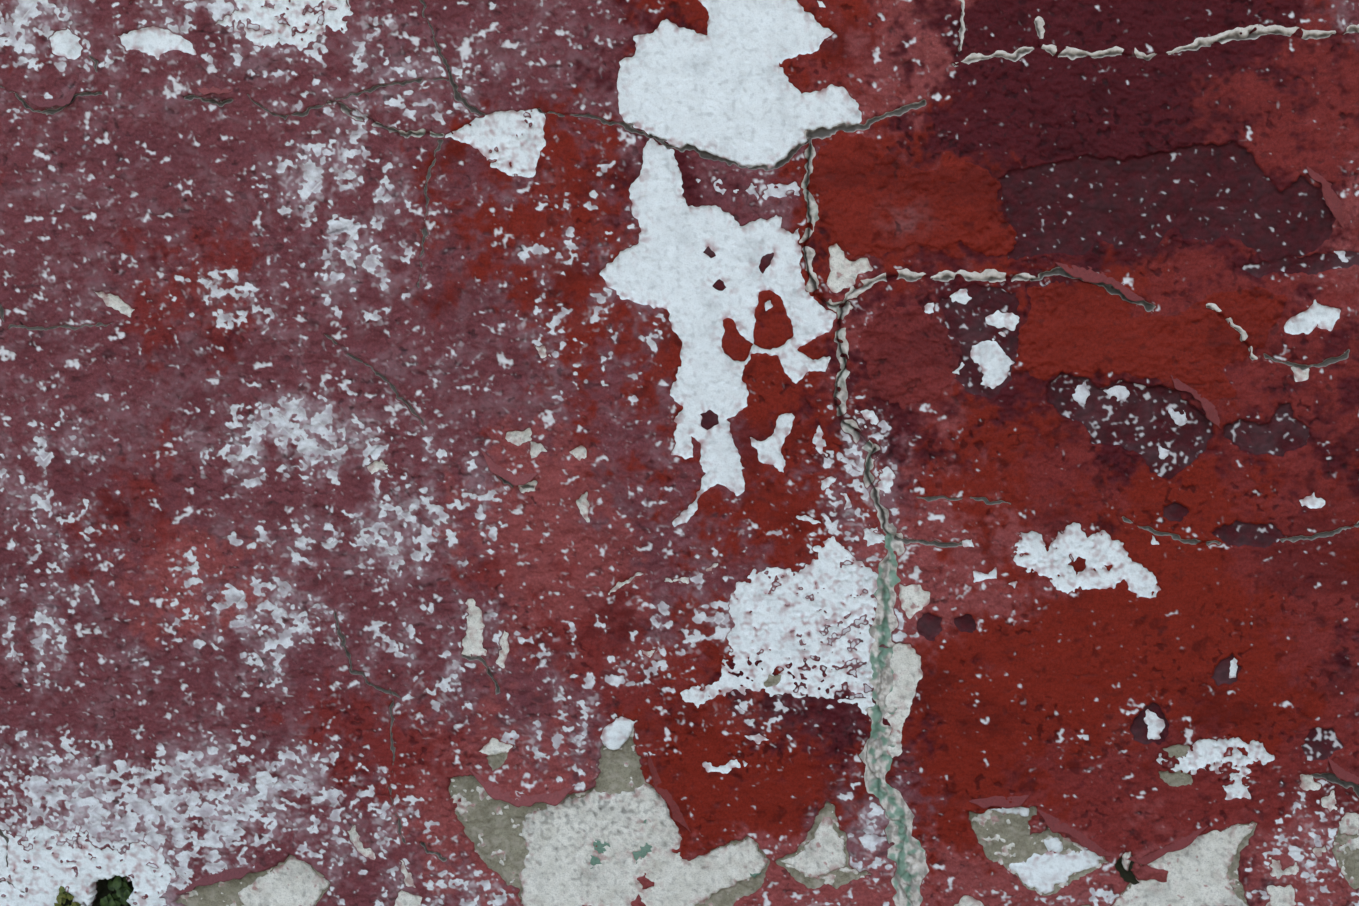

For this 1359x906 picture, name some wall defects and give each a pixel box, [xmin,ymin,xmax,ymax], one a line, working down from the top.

crack [952,0,1359,67]
peeling [0,0,615,321]
crack [184,0,485,288]
peeling [583,0,1359,527]
crack [1206,303,1350,370]
peeling [198,381,537,582]
spalling [0,407,976,906]
crack [538,99,1156,906]
peeling [973,522,1161,598]
crack [1122,516,1221,547]
crack [1280,521,1359,543]
spalling [969,727,1359,906]